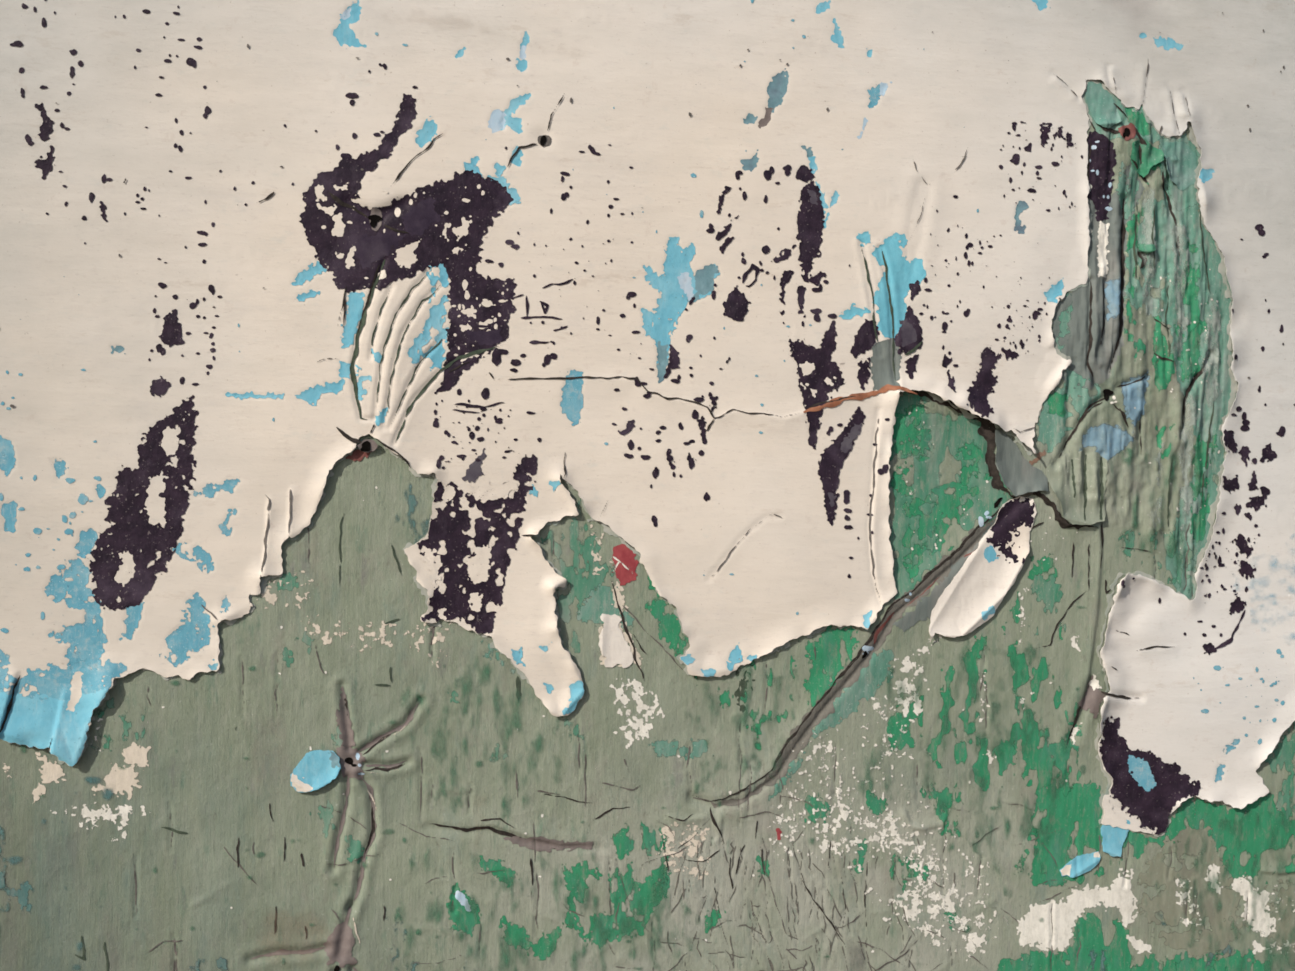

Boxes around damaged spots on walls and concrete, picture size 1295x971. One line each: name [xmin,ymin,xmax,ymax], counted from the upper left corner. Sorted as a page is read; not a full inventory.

rust [804,384,918,413]
peeling [250,487,300,607]
crack [224,64,1214,971]
peeling [397,81,1295,888]
peeling [0,528,145,767]
crack [162,817,188,835]
peeling [290,726,367,864]
crack [75,936,109,971]
crack [131,870,139,914]
crack [149,939,183,971]
peeling [499,822,672,961]
peeling [997,912,1274,971]